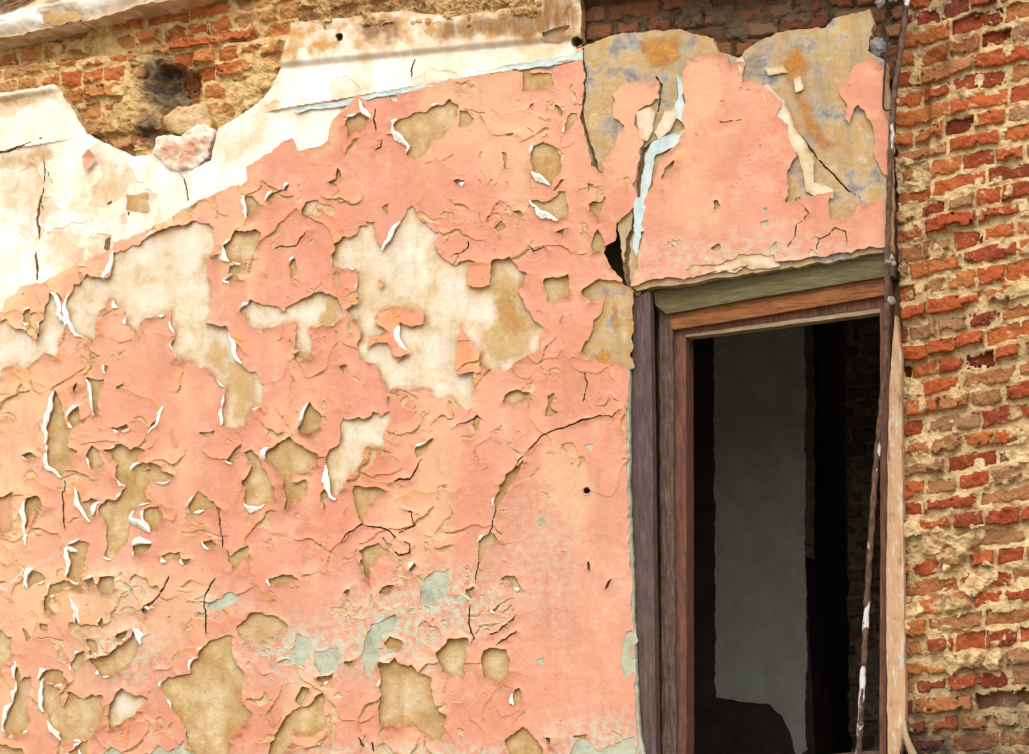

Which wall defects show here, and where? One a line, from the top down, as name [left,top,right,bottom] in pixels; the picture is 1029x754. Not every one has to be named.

crack [0,128,58,284]
flaking render [0,0,542,171]
peeling [295,165,348,223]
peeling [449,175,472,189]
crack [705,113,765,128]
crack [781,115,868,257]
peeling [0,179,635,526]
flaking render [488,0,1029,754]
peeling [0,359,641,754]